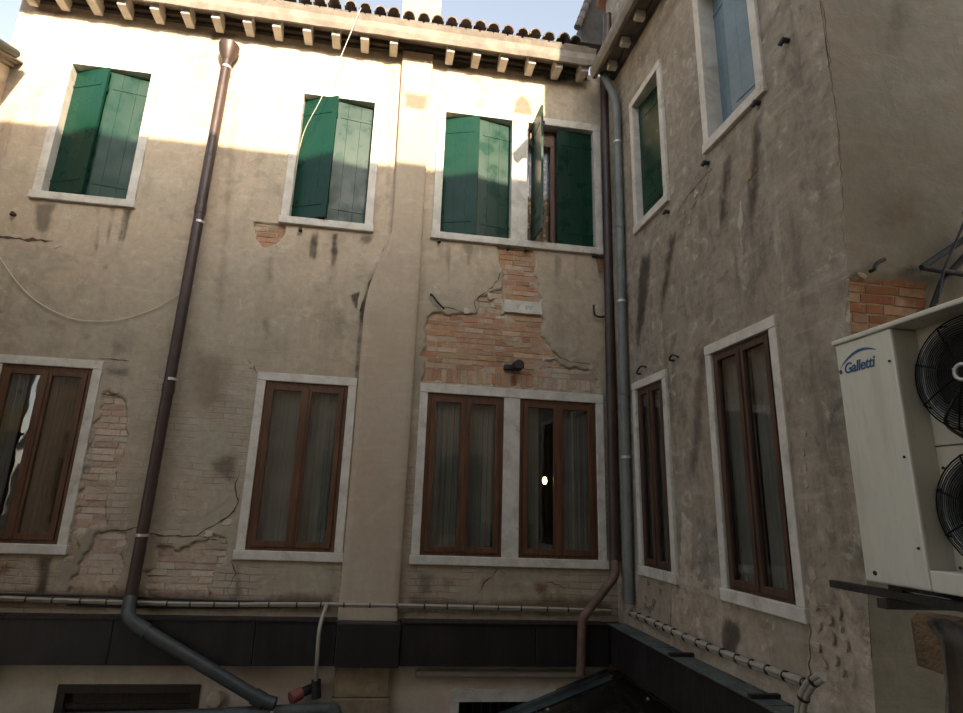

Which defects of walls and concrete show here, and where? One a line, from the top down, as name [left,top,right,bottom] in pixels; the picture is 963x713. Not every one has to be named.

crack [0,236,62,249]
flaking render [254,223,286,248]
flaking render [421,247,598,394]
flaking render [845,272,926,335]
crack [105,472,241,541]
flaking render [67,531,127,595]